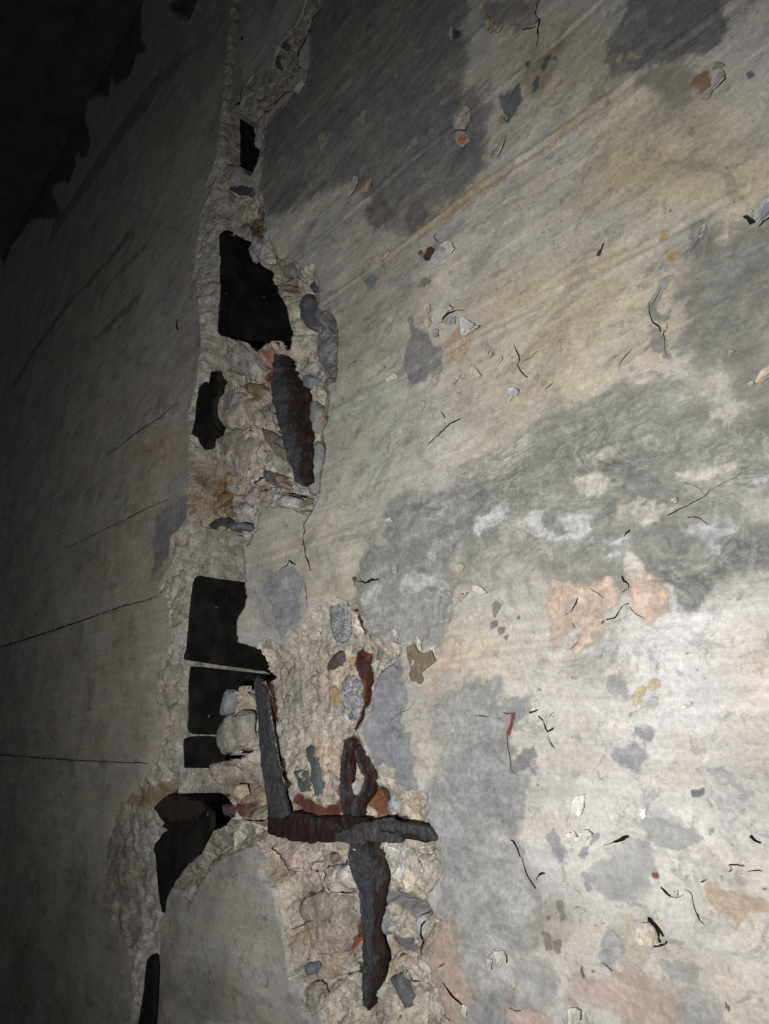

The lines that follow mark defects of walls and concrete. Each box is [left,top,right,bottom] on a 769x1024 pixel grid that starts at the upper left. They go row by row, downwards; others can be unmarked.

damp [259,0,728,237]
peeling [417,240,454,265]
crack [649,290,666,354]
crack [65,499,168,549]
spalling [102,0,445,1024]
crack [668,471,742,524]
crack [279,517,312,592]
crack [0,596,157,647]
damp [357,219,769,1024]
crack [2,754,148,764]
crack [511,840,545,889]
crack [647,917,667,948]